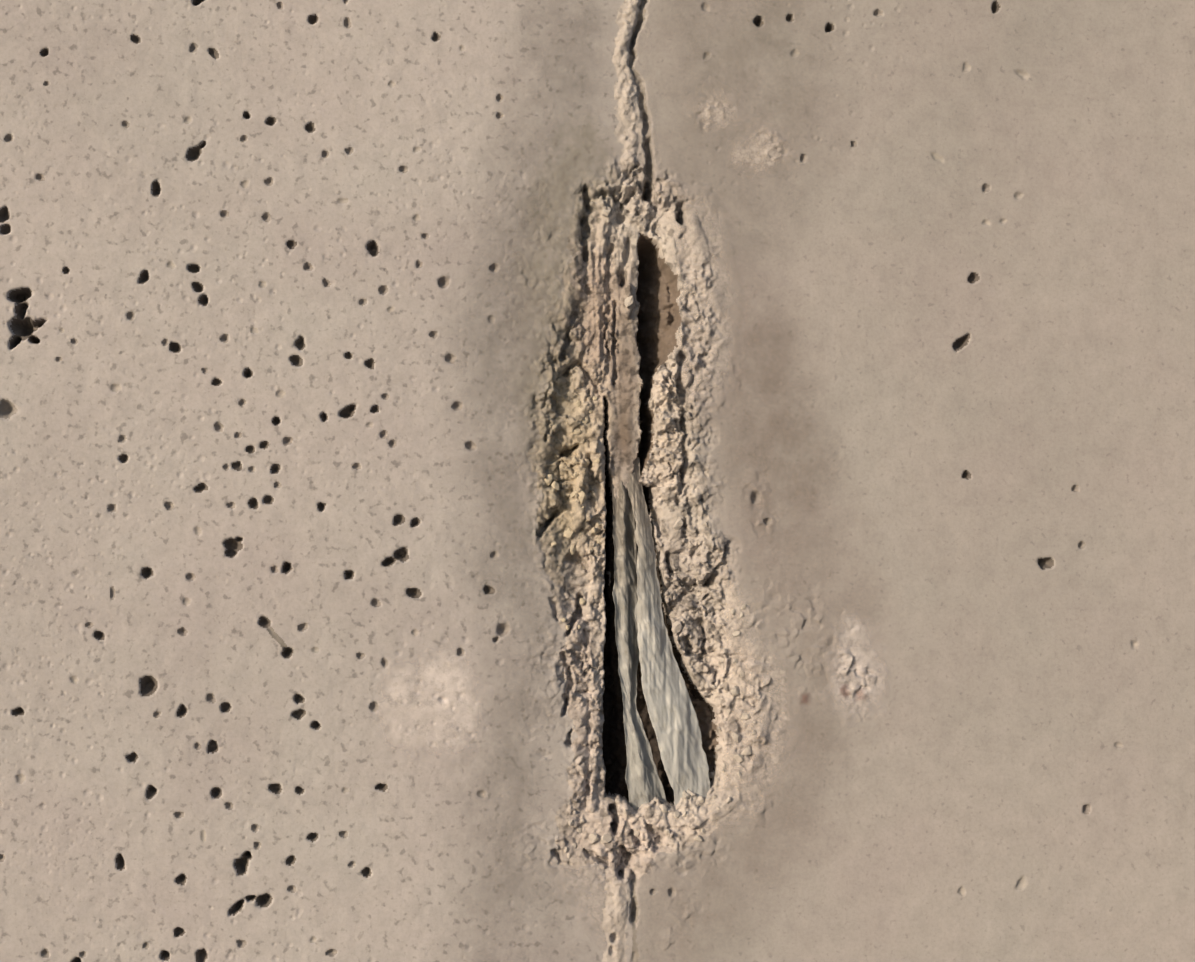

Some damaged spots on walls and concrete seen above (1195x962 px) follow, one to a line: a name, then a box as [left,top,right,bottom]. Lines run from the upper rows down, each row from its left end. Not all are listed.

crack [612,0,653,180]
spalling [527,162,770,882]
crack [599,871,639,962]